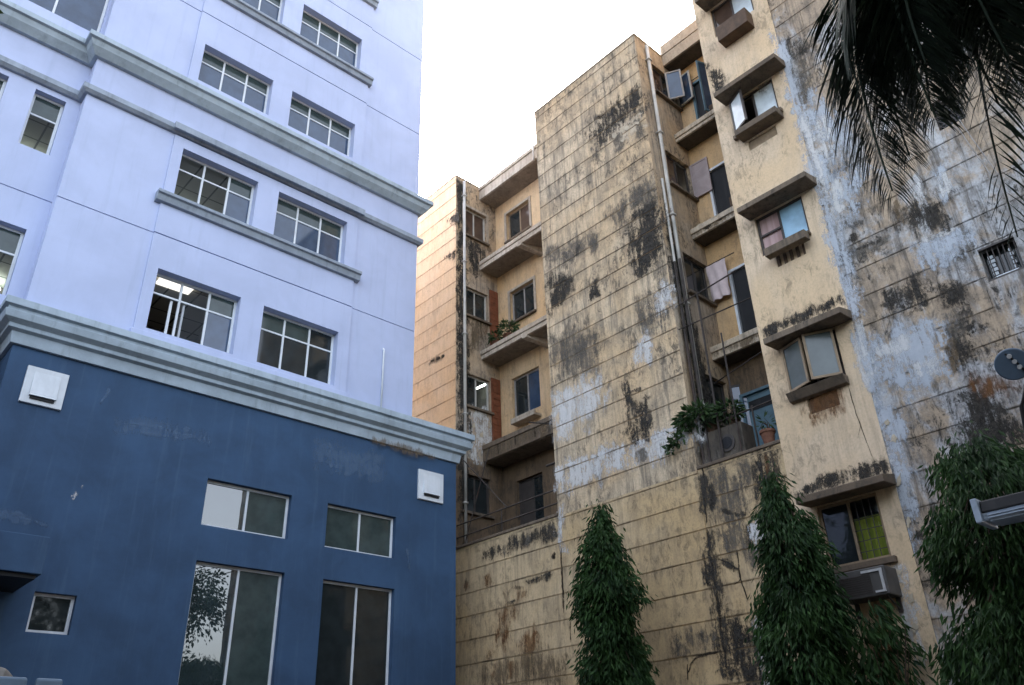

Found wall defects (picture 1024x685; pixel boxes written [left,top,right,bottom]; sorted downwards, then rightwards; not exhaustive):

damp [584,83,652,160]
damp [762,32,991,408]
damp [544,239,597,317]
damp [619,187,713,416]
damp [483,333,704,560]
damp [708,446,785,548]
damp [793,460,893,497]